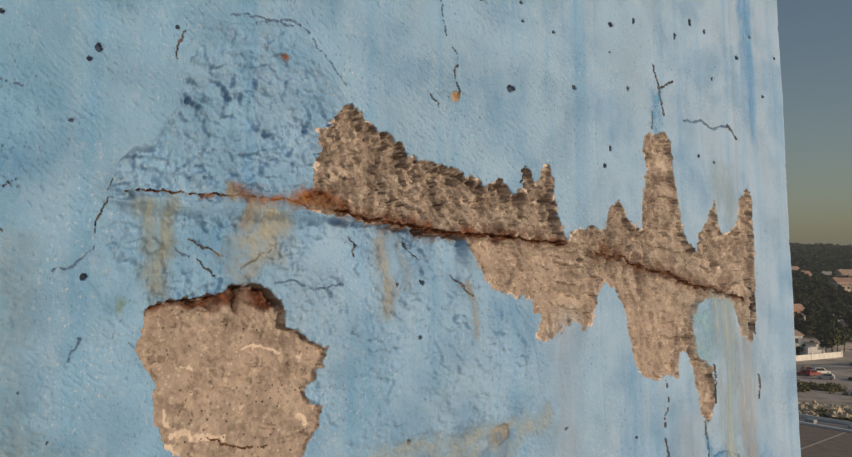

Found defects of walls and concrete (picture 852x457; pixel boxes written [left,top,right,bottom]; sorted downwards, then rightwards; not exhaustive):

crack [230,12,347,86]
crack [651,64,737,140]
crack [51,179,308,277]
corrosion [236,187,334,209]
corrosion [340,204,516,242]
spalling [107,20,757,423]
spalling [135,283,329,457]
crack [663,383,671,457]